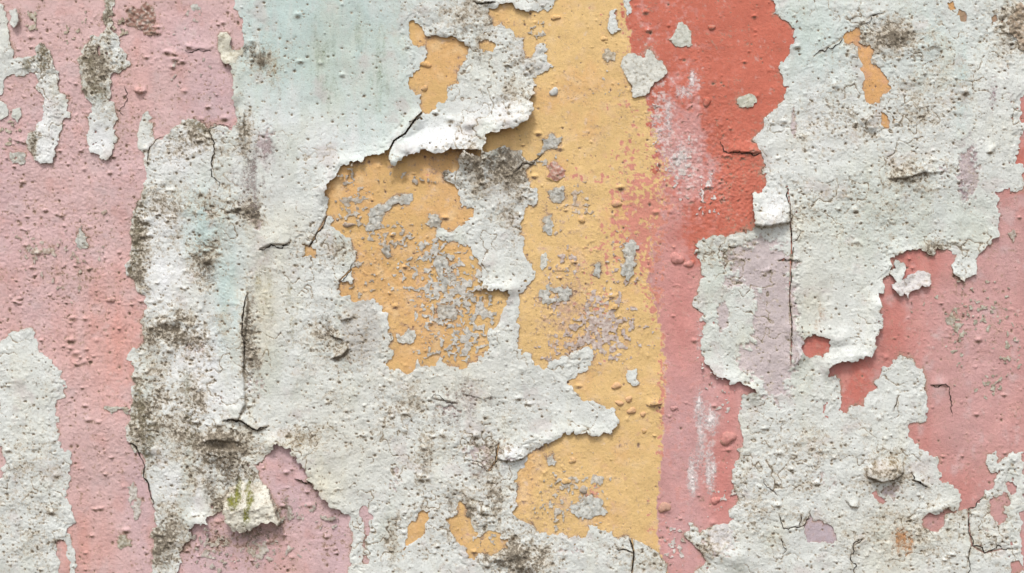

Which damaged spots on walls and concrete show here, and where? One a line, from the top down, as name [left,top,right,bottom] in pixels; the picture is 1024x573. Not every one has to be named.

peeling [0,4,71,164]
peeling [77,0,158,160]
peeling [669,22,692,47]
crack [240,295,248,365]
peeling [124,0,667,573]
crack [779,186,801,358]
peeling [684,0,1024,573]
peeling [0,328,77,573]
leakage [227,478,253,522]
crack [224,419,267,431]